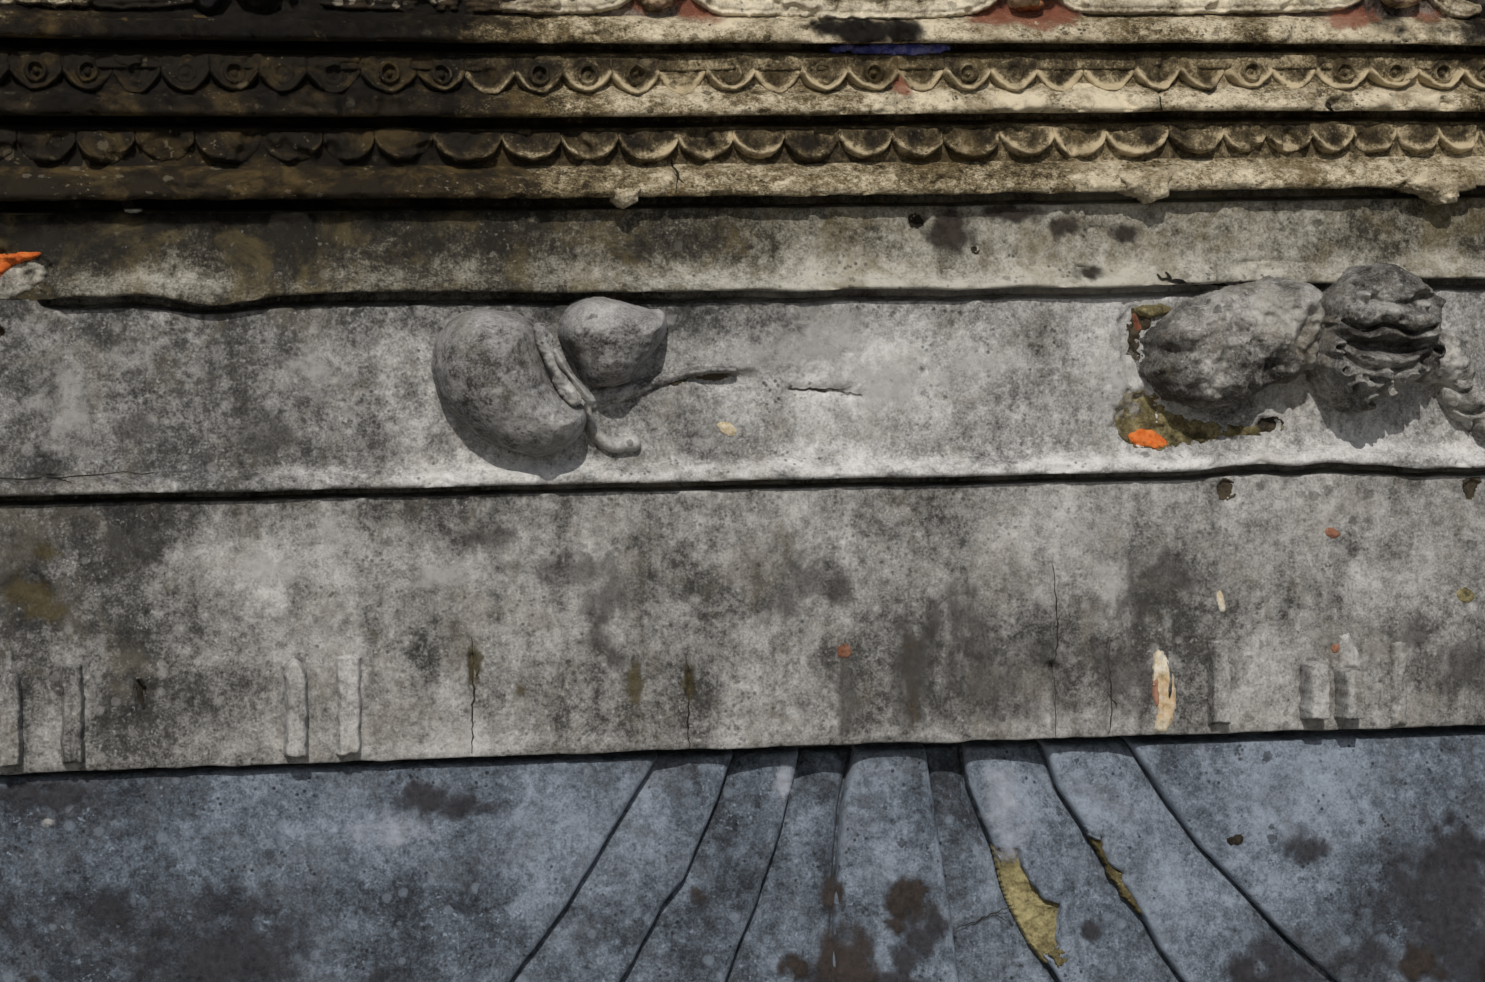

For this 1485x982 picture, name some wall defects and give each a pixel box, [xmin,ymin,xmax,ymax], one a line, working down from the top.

spalling [0,252,47,299]
leakage [158,885,311,982]
leakage [865,971,926,982]
spalling [991,843,1068,967]
leakage [1082,921,1100,941]
spalling [1083,825,1143,914]
leakage [1224,809,1485,982]